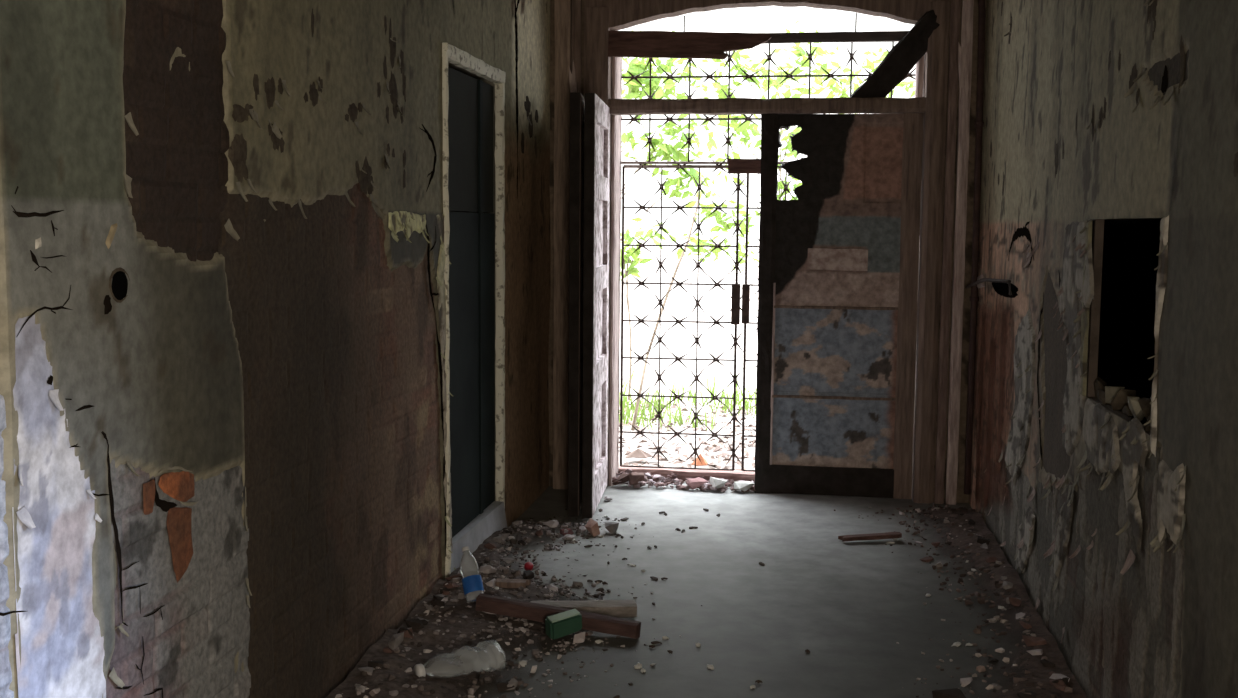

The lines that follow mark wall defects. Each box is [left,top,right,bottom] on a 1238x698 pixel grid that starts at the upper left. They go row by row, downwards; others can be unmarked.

spalling [1108,35,1189,113]
crack [11,186,72,336]
crack [65,399,164,698]
spalling [977,215,1186,698]